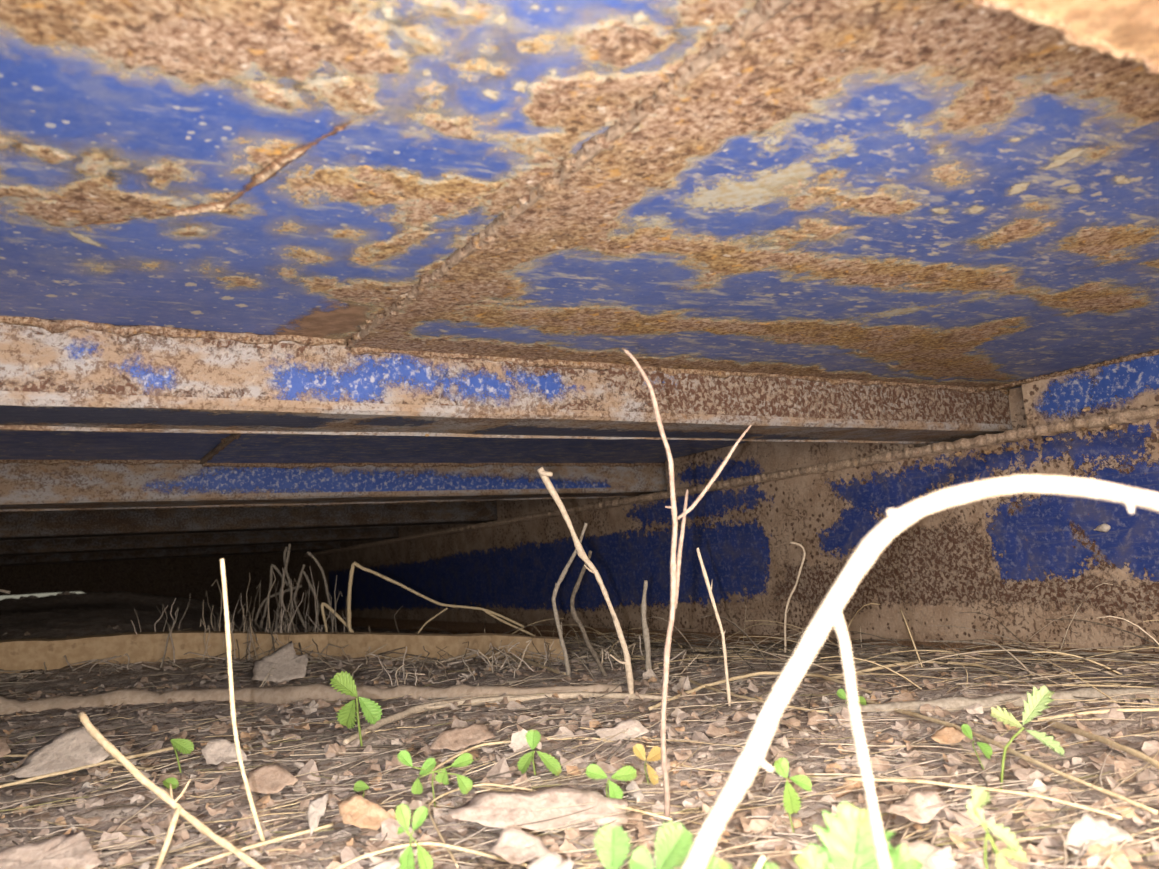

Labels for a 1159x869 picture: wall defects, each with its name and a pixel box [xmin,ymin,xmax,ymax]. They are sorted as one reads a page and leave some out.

crack [74,122,350,226]
spalling [483,80,528,100]
corrosion [0,0,1159,425]
peeling [676,132,855,212]
peeling [892,115,937,140]
peeling [1040,148,1085,170]
peeling [971,182,1159,268]
peeling [142,466,611,495]
peeling [816,354,1159,561]
corrosion [774,559,847,608]
corrosion [842,510,1159,617]
peeling [986,493,1159,584]